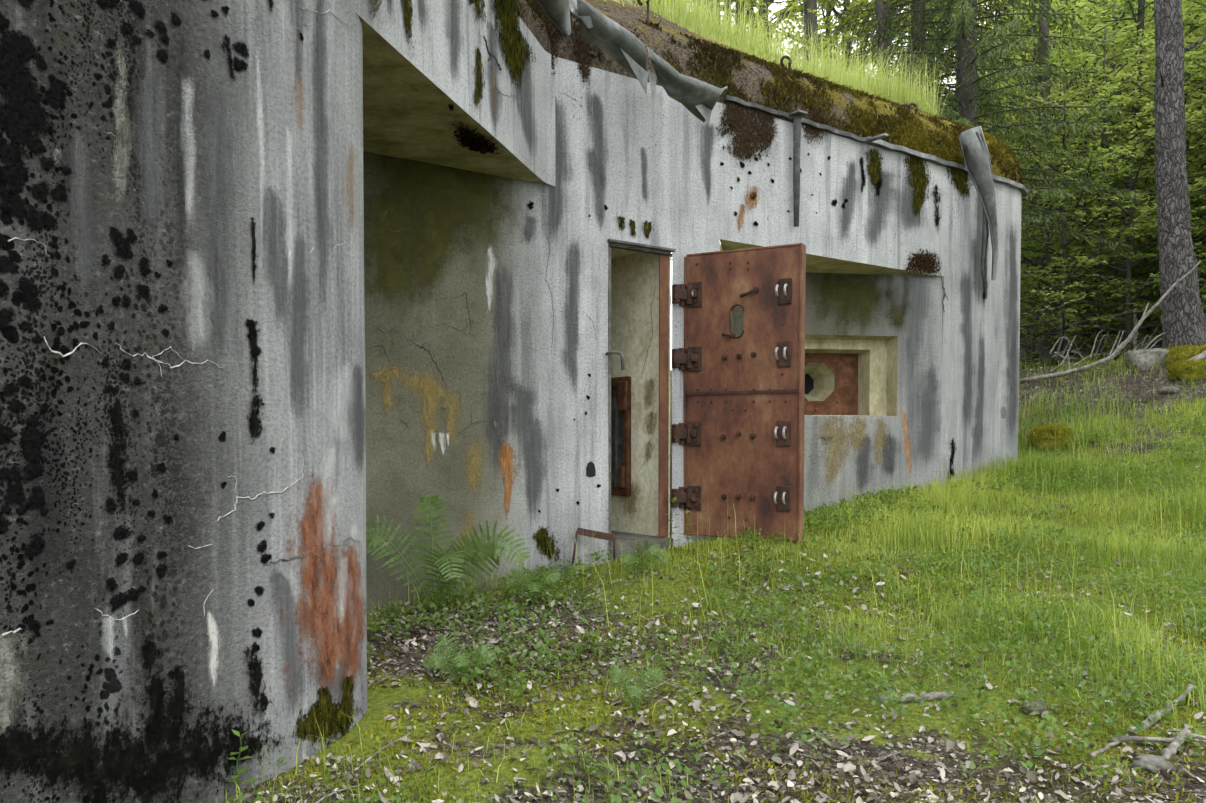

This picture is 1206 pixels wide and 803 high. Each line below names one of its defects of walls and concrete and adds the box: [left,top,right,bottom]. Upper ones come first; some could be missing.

leakage [137,79,160,223]
leakage [73,133,90,290]
leakage [209,92,228,338]
corrosion [738,187,759,230]
crack [44,336,230,376]
crack [368,292,475,393]
crack [188,429,312,549]
corrosion [498,442,518,516]
corrosion [820,417,885,481]
crack [268,536,360,565]
corrosion [287,473,366,691]
efflorescence [0,635,27,735]